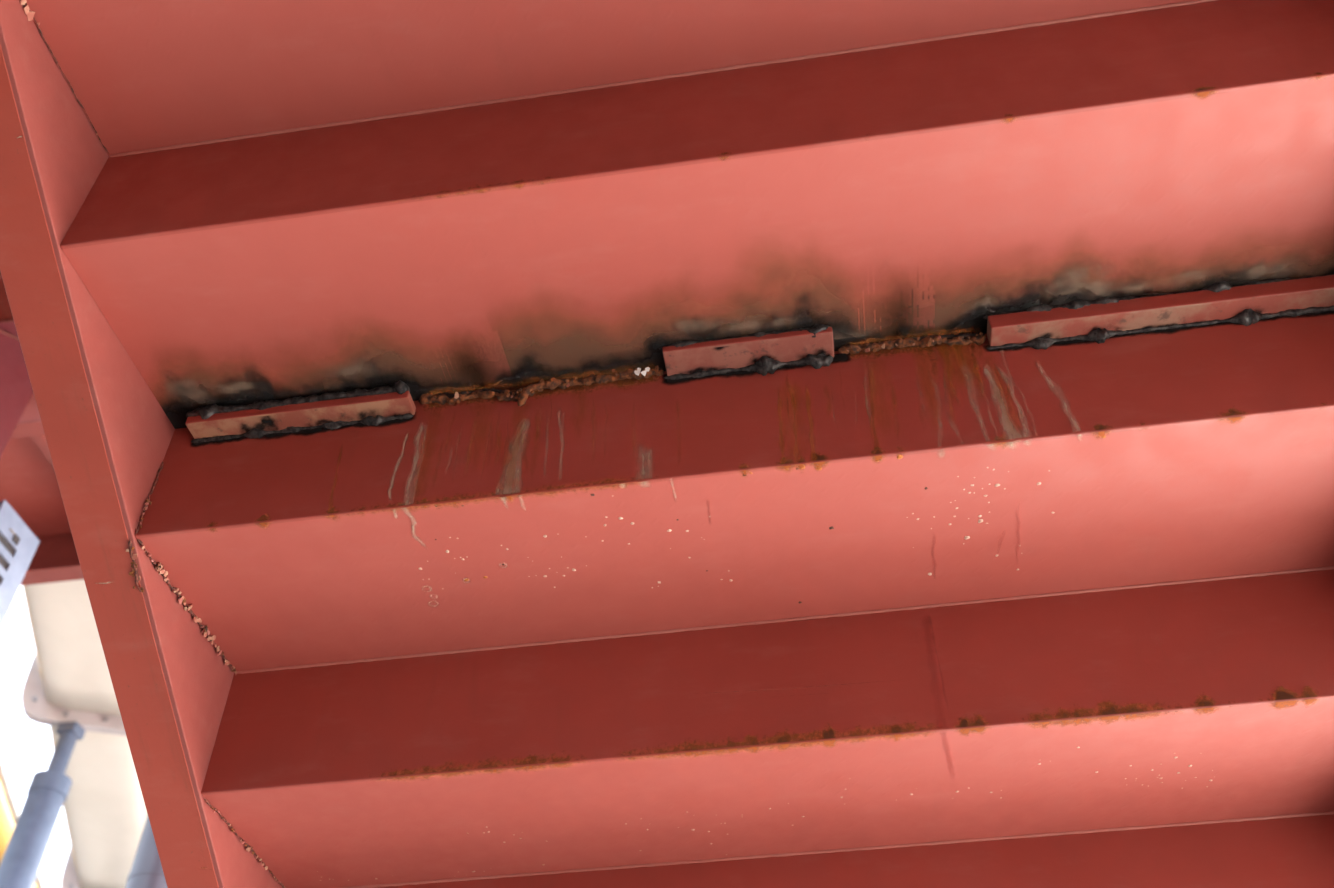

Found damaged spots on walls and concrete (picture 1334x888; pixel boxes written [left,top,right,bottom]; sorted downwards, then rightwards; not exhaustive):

corrosion [1219,409,1244,423]
damp [388,426,425,503]
corrosion [779,453,828,470]
peeling [126,539,237,675]
corrosion [957,716,988,735]
corrosion [1031,702,1177,728]
corrosion [1195,696,1217,713]
corrosion [1272,686,1317,709]
corrosion [628,723,928,760]
corrosion [390,756,570,779]